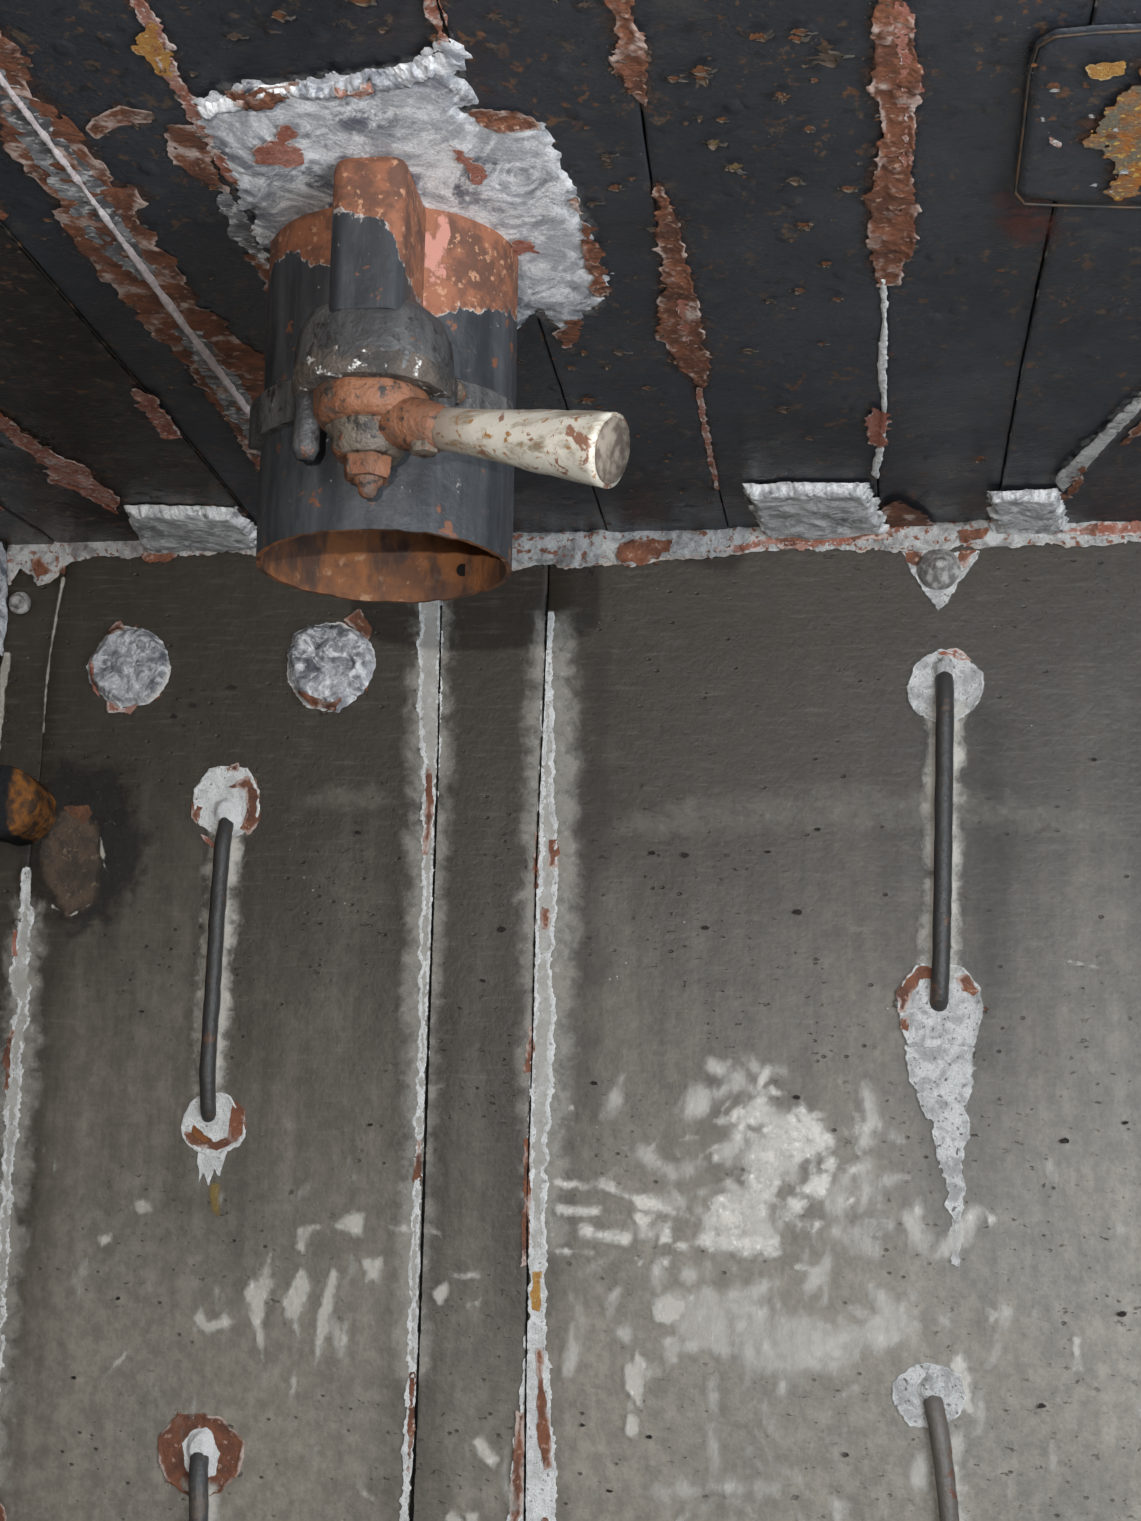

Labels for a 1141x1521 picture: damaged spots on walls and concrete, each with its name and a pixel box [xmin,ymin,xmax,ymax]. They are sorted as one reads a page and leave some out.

corrosion [0,0,265,470]
peeling [216,190,270,292]
corrosion [604,0,652,106]
corrosion [651,183,713,388]
corrosion [859,0,927,287]
corrosion [1049,61,1141,205]
corrosion [714,501,935,553]
water stain [521,623,675,1266]
water stain [0,905,40,1484]
water stain [730,1235,780,1257]
water stain [804,1157,871,1214]
water stain [904,1041,975,1269]